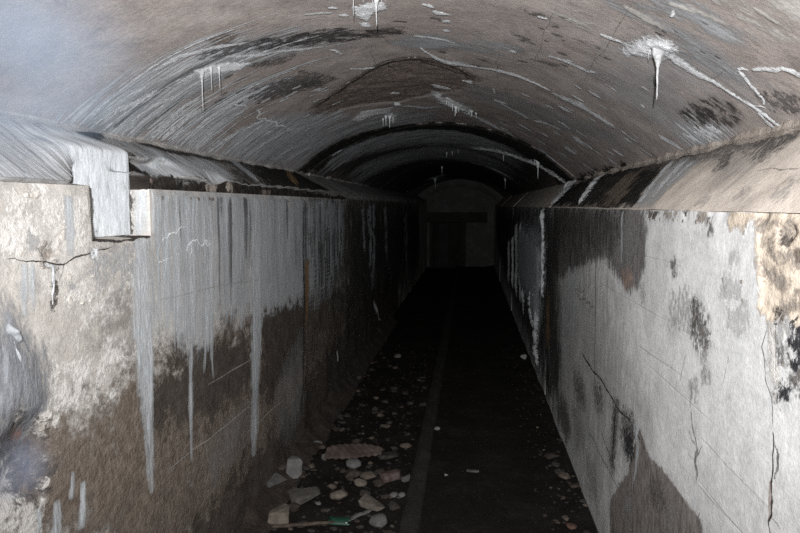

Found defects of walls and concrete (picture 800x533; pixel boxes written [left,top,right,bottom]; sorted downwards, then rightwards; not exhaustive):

damp [604,0,800,82]
damp [518,124,624,167]
crack [9,226,211,281]
damp [0,19,522,533]
crack [575,254,643,499]
damp [573,368,702,533]
spalling [720,212,800,403]
crack [762,323,779,533]